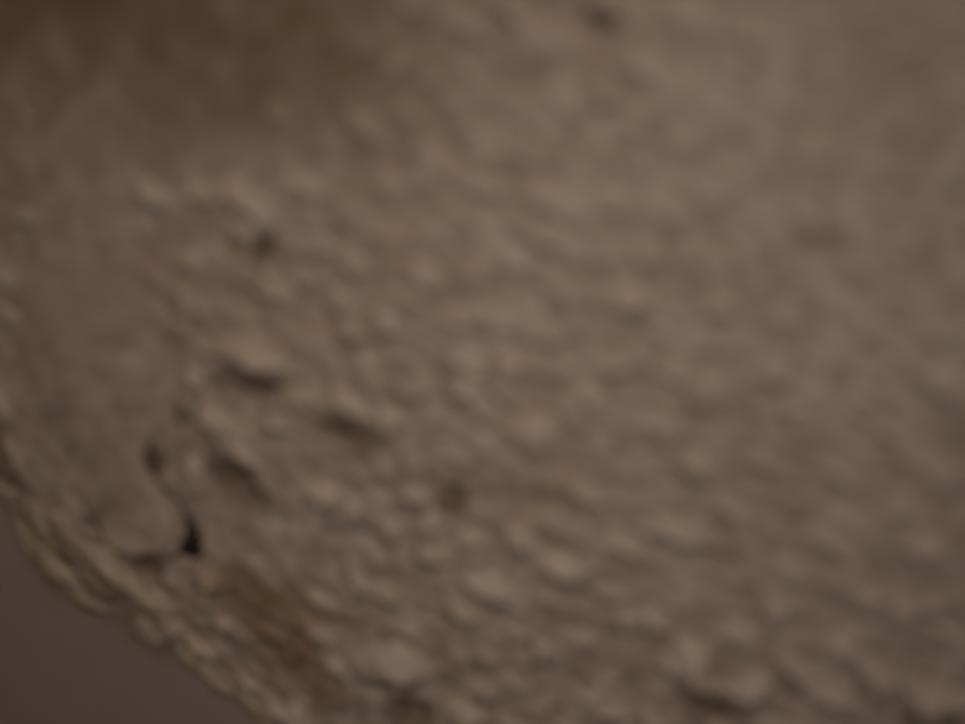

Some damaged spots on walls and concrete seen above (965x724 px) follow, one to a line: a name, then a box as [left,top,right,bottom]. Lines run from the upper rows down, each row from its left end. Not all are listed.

spalling [178,510,204,560]